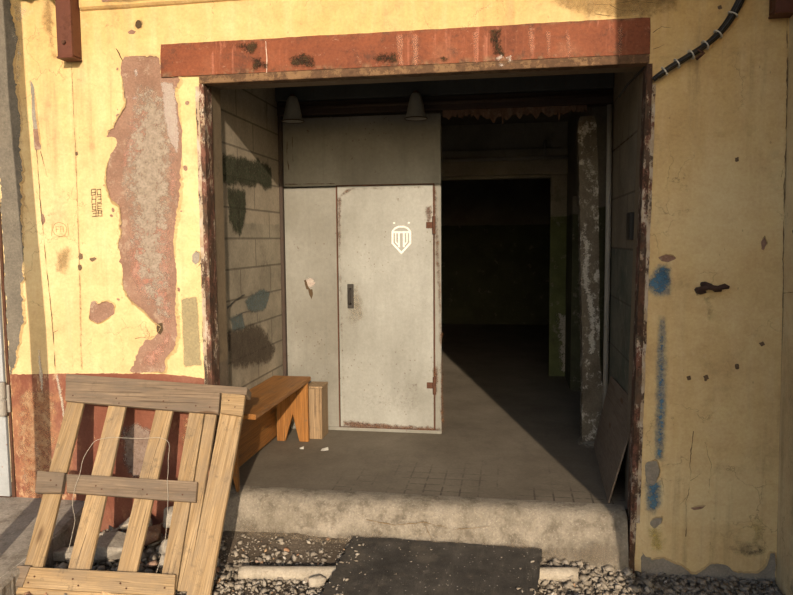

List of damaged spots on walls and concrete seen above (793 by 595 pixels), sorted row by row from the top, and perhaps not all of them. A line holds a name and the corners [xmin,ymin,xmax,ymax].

crack [783,34,791,128]
peeling [89,54,189,374]
leakage [222,155,272,235]
crack [781,149,793,323]
peeling [12,263,27,371]
peeling [582,239,596,354]
crack [683,431,712,537]
peeling [641,551,776,584]